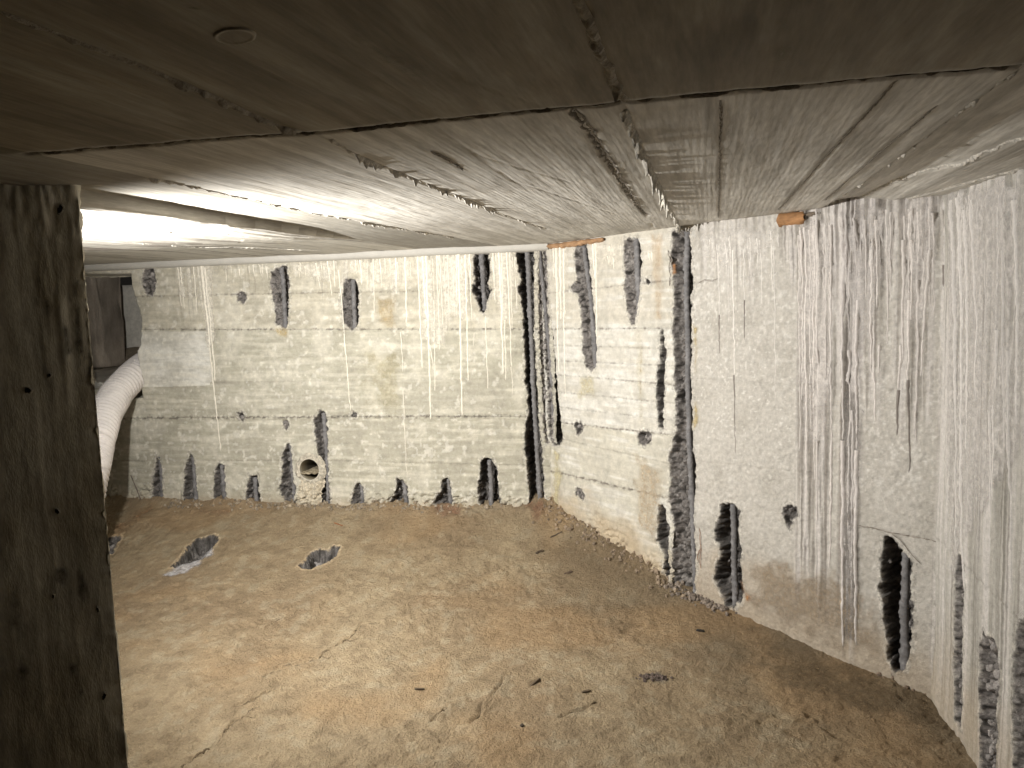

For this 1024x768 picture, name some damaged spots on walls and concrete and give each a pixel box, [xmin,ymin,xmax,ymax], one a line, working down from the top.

crack [40,65,1011,215]
damp [298,254,488,419]
spalling [469,253,495,317]
damp [491,252,517,393]
spalling [513,250,587,505]
damp [552,247,565,378]
spalling [568,240,600,374]
spalling [635,226,747,611]
damp [704,231,779,453]
damp [753,182,1024,646]
spalling [874,532,919,677]
spalling [951,543,1024,768]